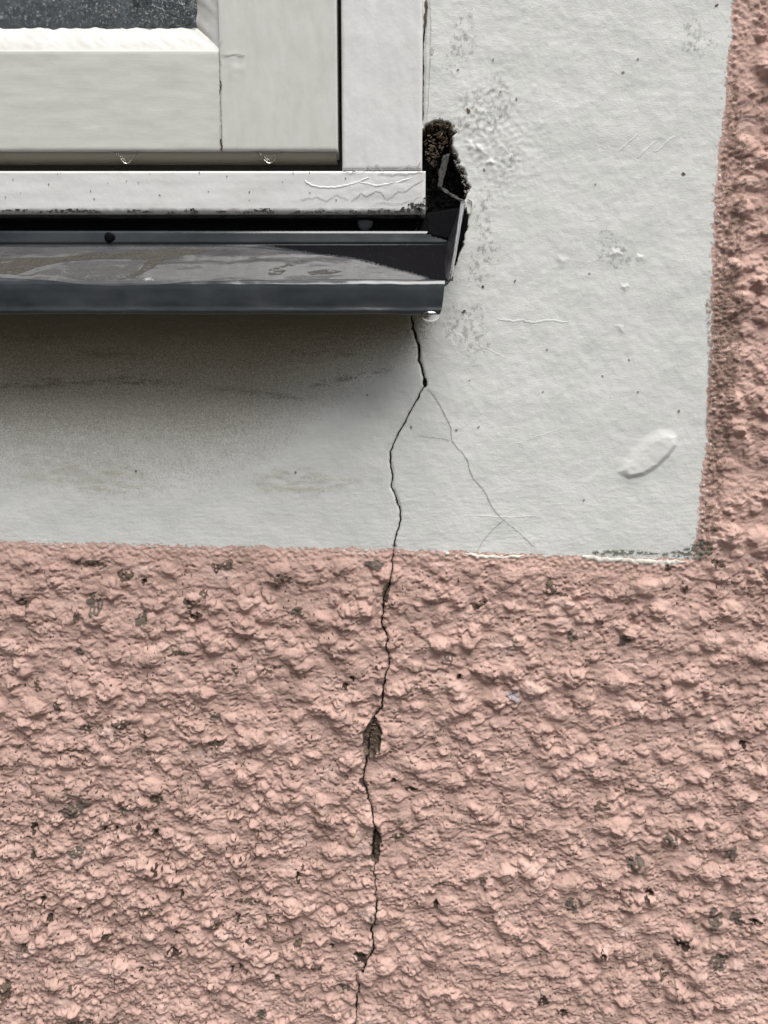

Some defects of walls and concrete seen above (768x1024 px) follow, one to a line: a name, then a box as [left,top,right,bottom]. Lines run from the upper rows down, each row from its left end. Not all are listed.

crack [354,316,536,1024]